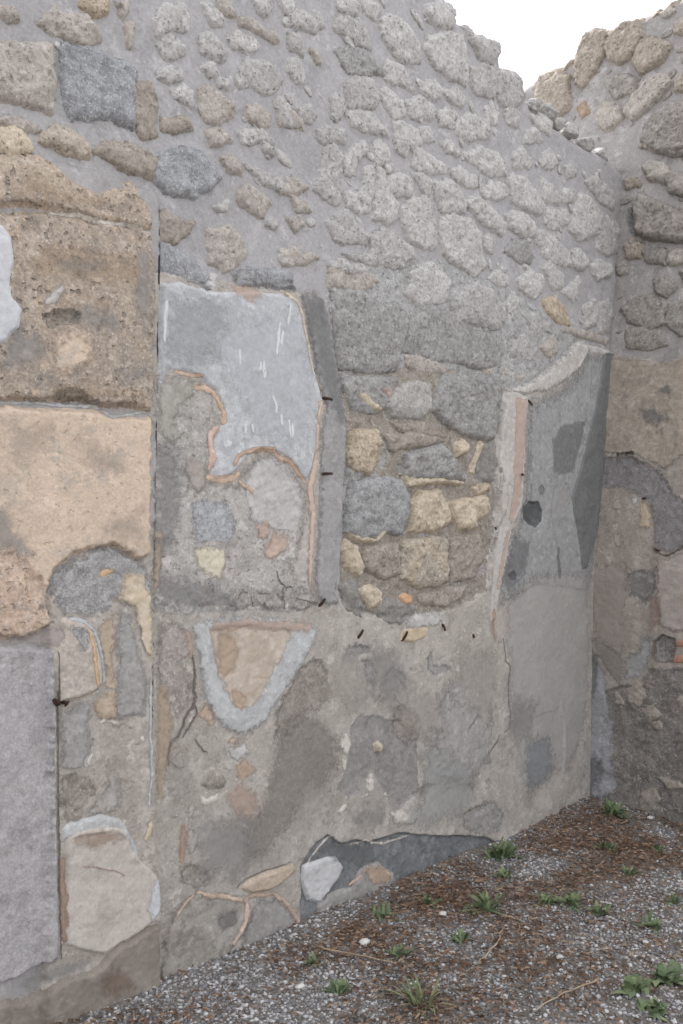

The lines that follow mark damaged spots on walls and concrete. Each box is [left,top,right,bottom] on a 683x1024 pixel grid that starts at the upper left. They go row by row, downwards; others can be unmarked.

crack [167,656,207,769]
flaking render [240,702,503,920]
spalling [337,340,609,643]
flaking render [591,455,683,824]